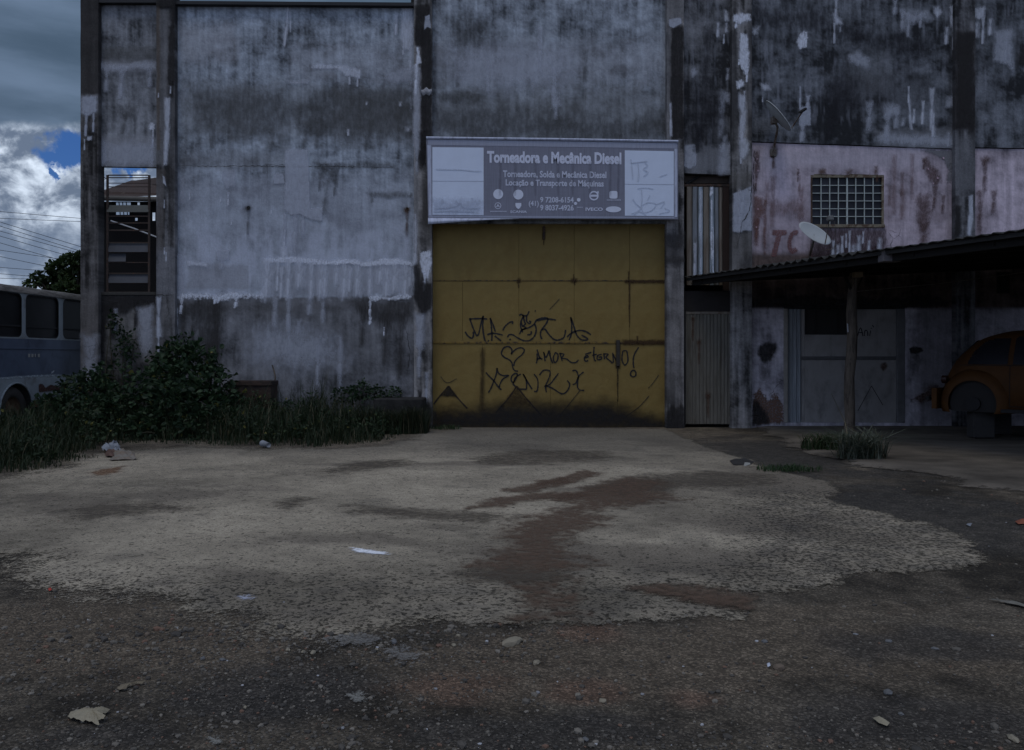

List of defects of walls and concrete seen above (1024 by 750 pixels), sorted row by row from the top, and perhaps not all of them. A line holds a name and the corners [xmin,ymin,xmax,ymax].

peeling [721,13,766,254]
flaking render [752,388,784,425]